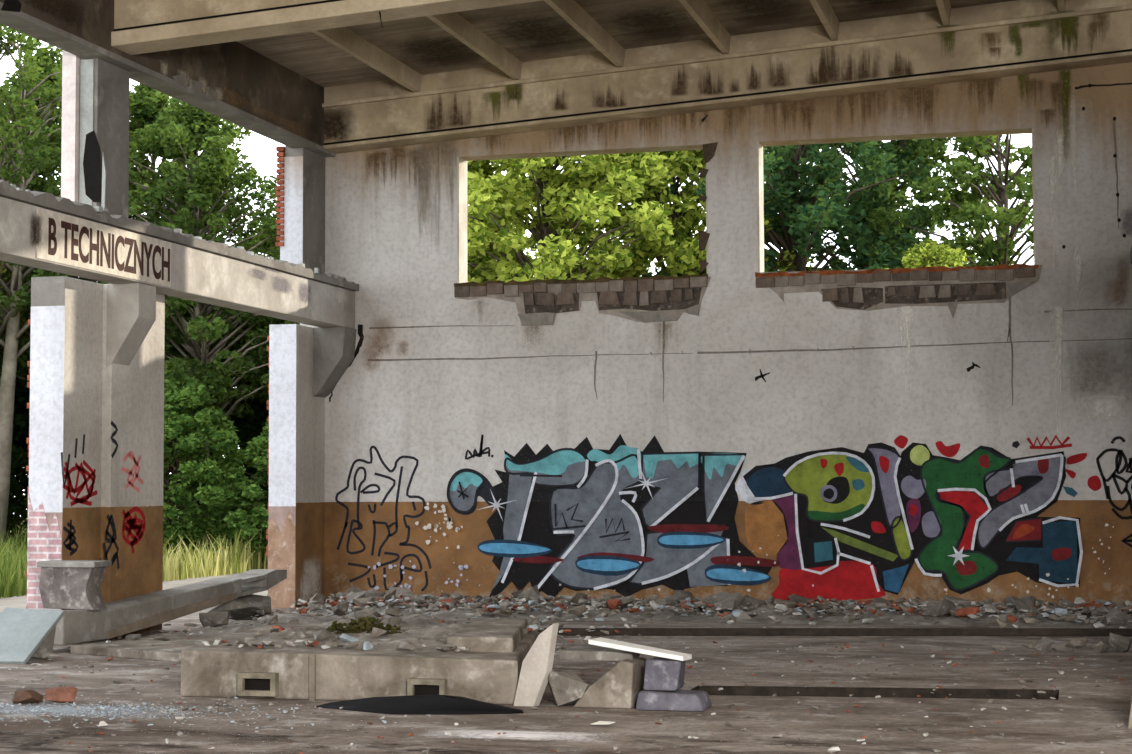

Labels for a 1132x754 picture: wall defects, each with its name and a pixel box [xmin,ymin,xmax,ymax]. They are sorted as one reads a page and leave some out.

water stain [428,98,463,130]
water stain [489,85,521,113]
water stain [672,73,686,95]
water stain [699,68,786,94]
water stain [1018,69,1076,199]
water stain [367,147,419,176]
spalling [454,274,711,326]
spalling [755,264,1043,318]